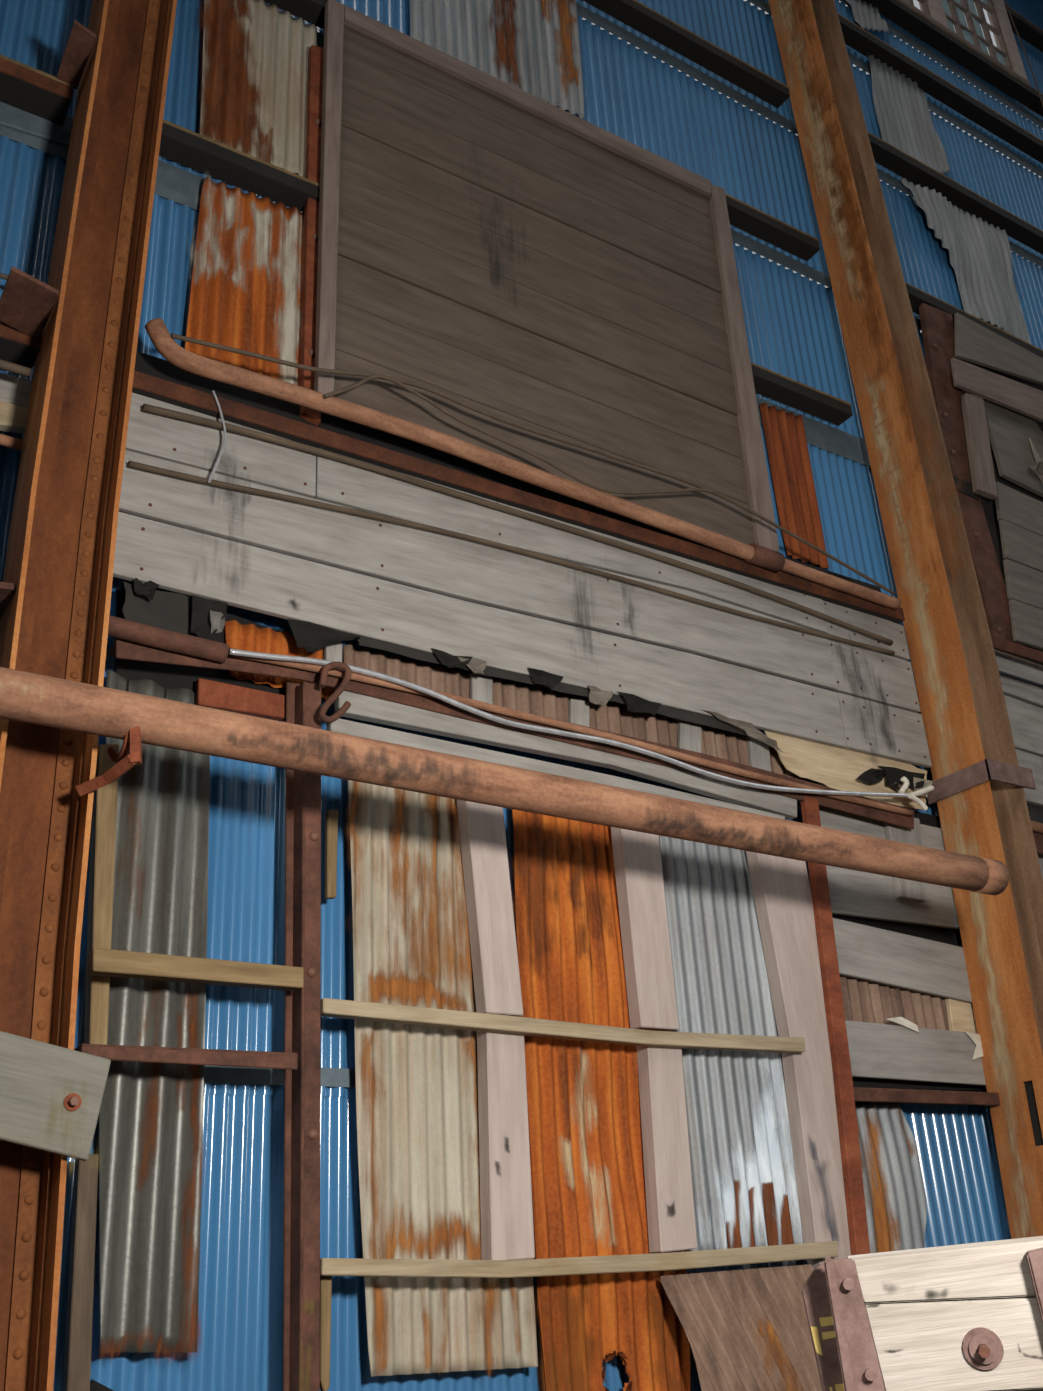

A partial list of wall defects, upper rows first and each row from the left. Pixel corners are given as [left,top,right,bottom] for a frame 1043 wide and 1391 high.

corrosion [200,0,317,178]
corrosion [185,177,304,386]
corrosion [759,403,830,571]
peeling [122,577,228,639]
corrosion [225,620,324,660]
corrosion [492,680,679,748]
spalling [287,619,933,810]
corrosion [369,788,473,1011]
corrosion [512,809,685,1259]
corrosion [362,1032,481,1260]
corrosion [856,1110,900,1253]
corrosion [536,1269,690,1391]